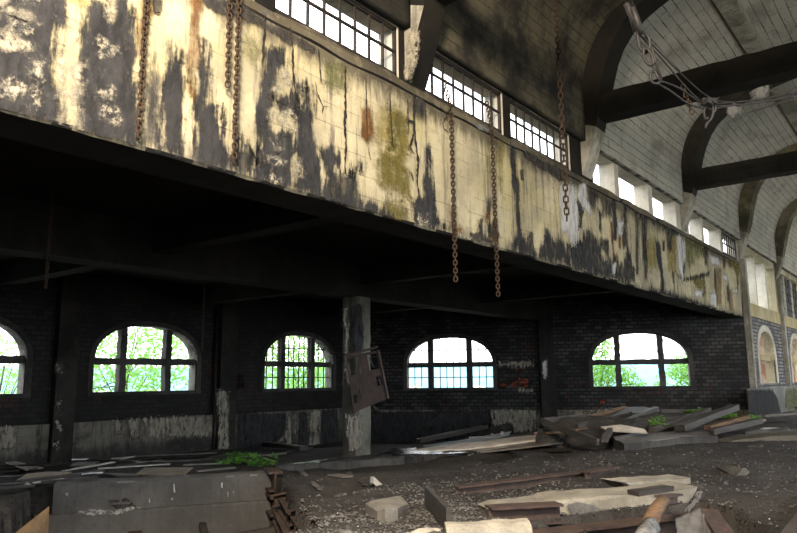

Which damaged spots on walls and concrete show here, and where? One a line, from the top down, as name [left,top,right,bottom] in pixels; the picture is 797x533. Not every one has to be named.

rust [188,0,201,97]
damp [275,79,317,116]
rust [361,106,374,144]
damp [559,183,623,273]
damp [635,216,686,283]
damp [695,256,737,312]
peeling [0,424,18,451]
peeling [112,375,243,450]
peeling [278,414,297,444]
peeling [308,410,320,445]
peeling [345,412,363,452]
peeling [491,408,539,433]